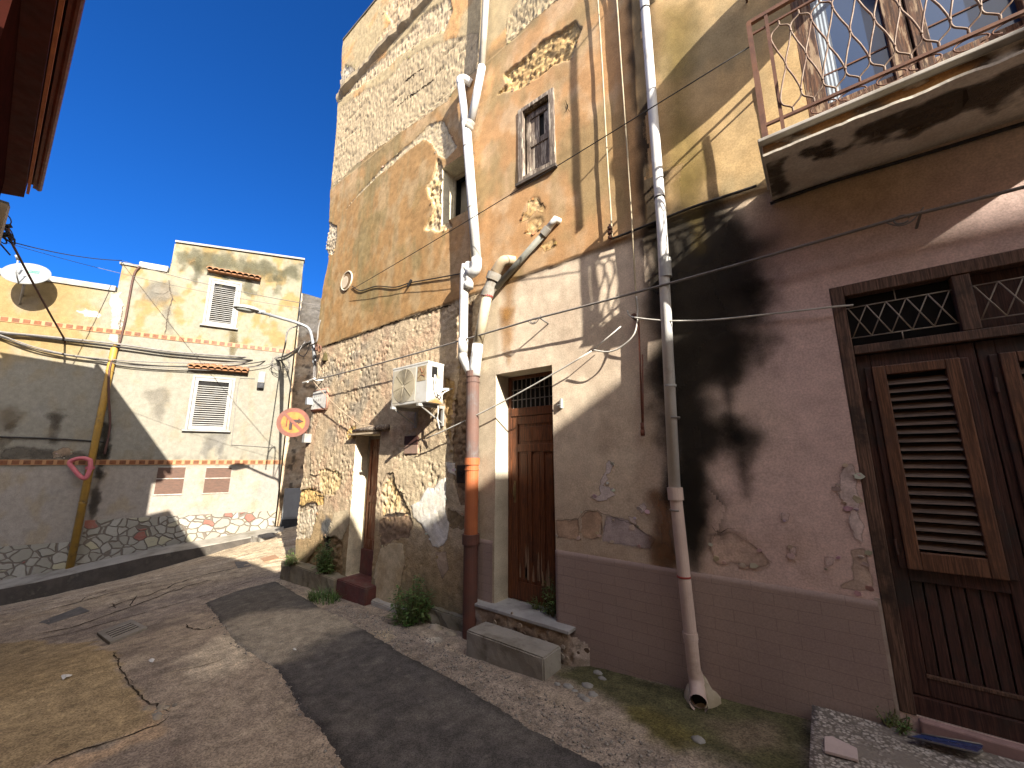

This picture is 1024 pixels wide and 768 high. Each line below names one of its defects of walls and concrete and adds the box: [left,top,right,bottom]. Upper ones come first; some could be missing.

flaking render [506,0,556,44]
spalling [500,22,581,93]
flaking render [333,0,479,232]
water stain [800,64,1024,160]
water stain [766,158,789,197]
spalling [520,197,557,251]
mould [179,251,297,280]
peeling [556,511,603,540]
peeling [831,463,875,597]
crack [41,652,169,768]